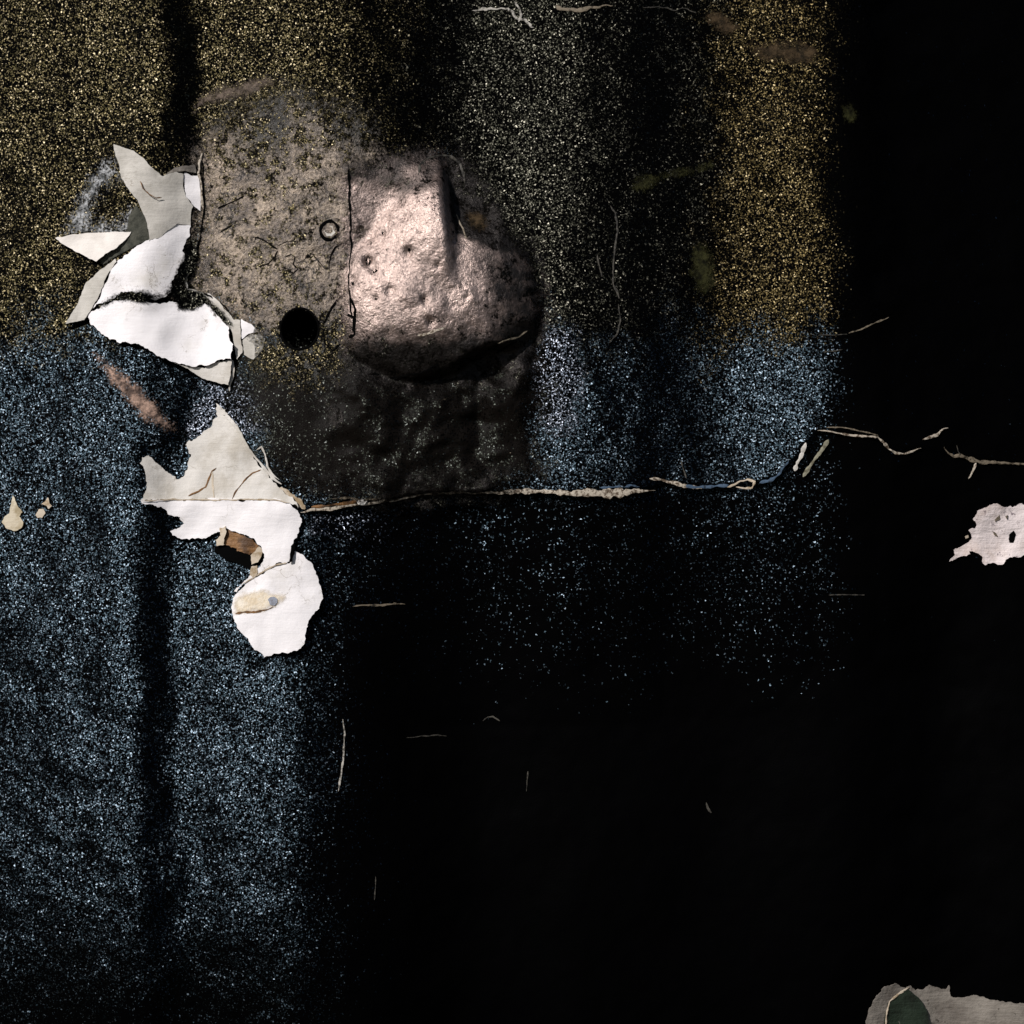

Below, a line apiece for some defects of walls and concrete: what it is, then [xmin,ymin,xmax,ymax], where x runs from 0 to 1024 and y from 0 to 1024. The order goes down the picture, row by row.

spalling [56,78,382,395]
crack [254,168,358,351]
damp [181,376,271,438]
crack [817,427,1024,479]
peeling [2,496,24,531]
peeling [36,498,52,518]
peeling [140,403,323,657]
crack [301,461,789,513]
peeling [949,503,1024,565]
peeling [865,983,1024,1024]